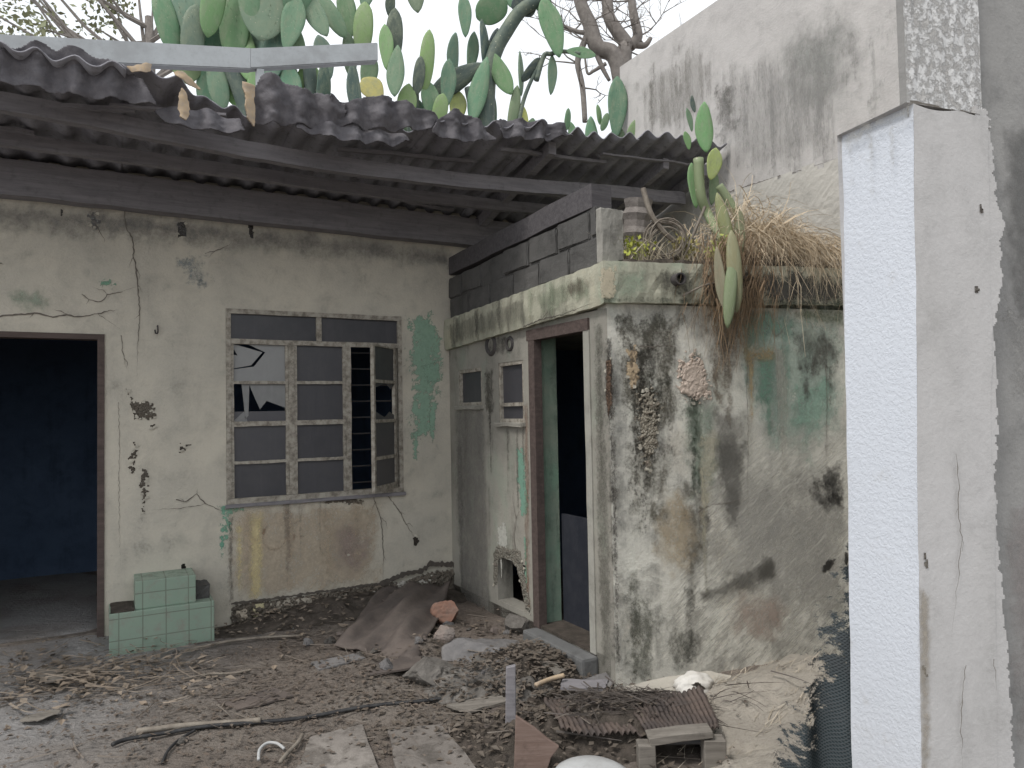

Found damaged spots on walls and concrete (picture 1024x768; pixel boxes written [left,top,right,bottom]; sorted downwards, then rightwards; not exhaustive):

water stain [715,30,836,158]
crack [0,211,141,365]
water stain [742,270,843,306]
flaking render [126,389,157,430]
flaking render [676,349,713,405]
water stain [797,333,835,399]
flaking render [128,442,149,514]
crack [372,496,413,563]
water stain [596,313,685,675]
water stain [683,368,848,601]
spalling [492,544,531,615]